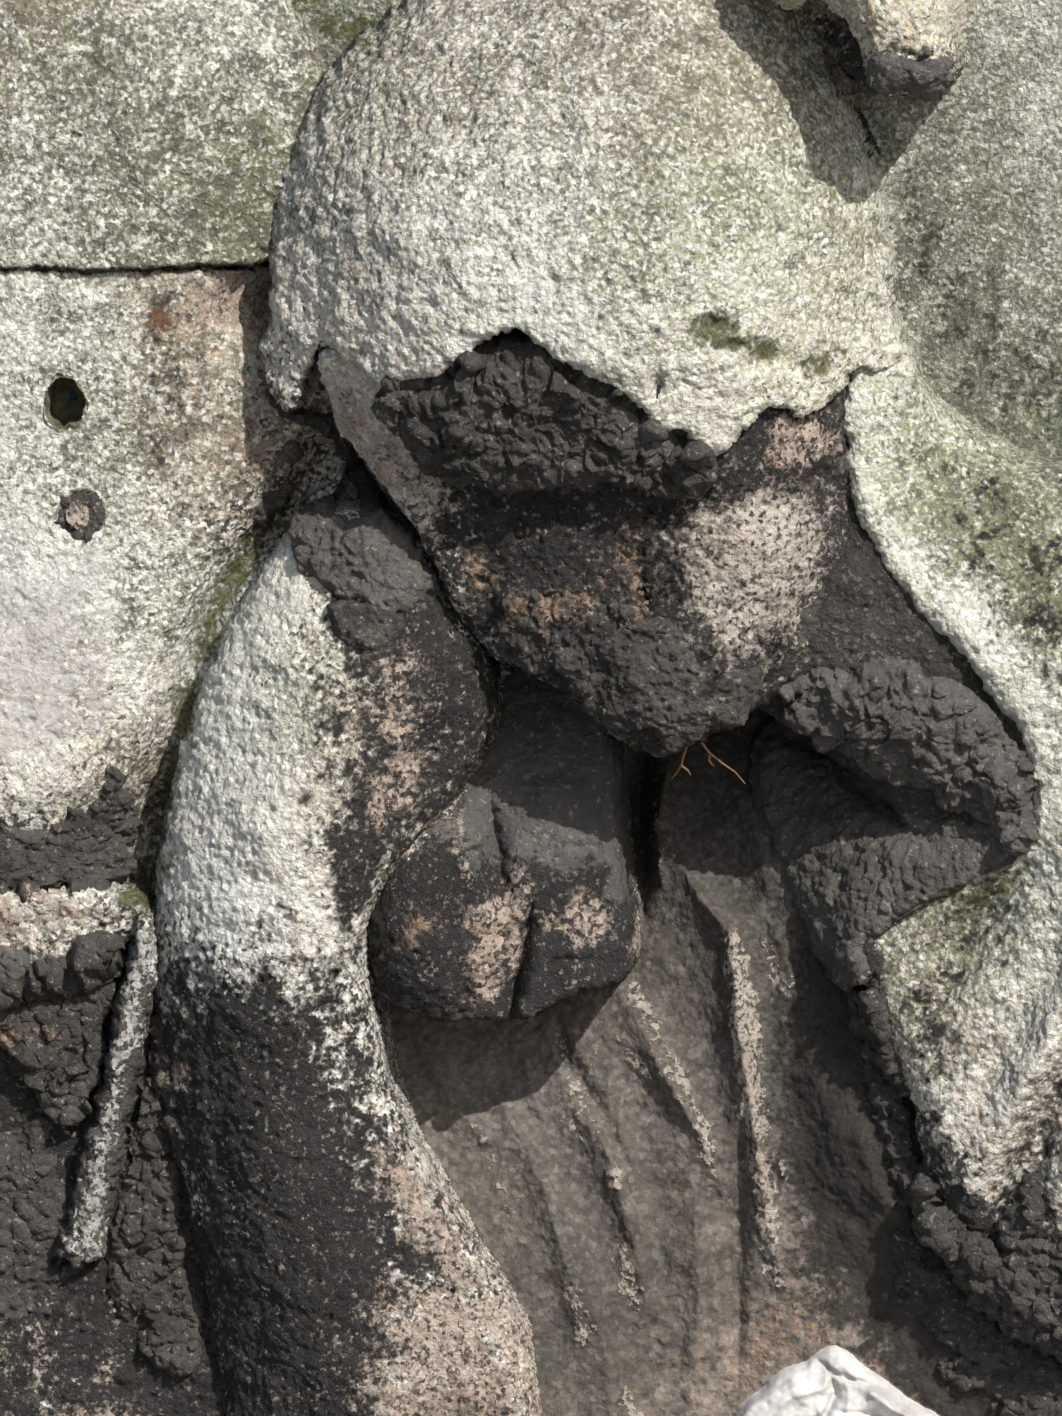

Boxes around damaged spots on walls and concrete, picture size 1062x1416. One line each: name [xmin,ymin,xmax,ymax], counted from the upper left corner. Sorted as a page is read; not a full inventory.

spalling [318,361,454,514]
peeling [597,396,678,458]
spalling [460,409,844,690]
spalling [326,599,442,846]
spalling [448,806,487,887]
spalling [452,863,534,1007]
leakage [861,940,884,988]
leakage [909,885,1027,1088]
leakage [63,919,158,1263]
leakage [470,1123,518,1218]
leakage [914,1075,1062,1246]